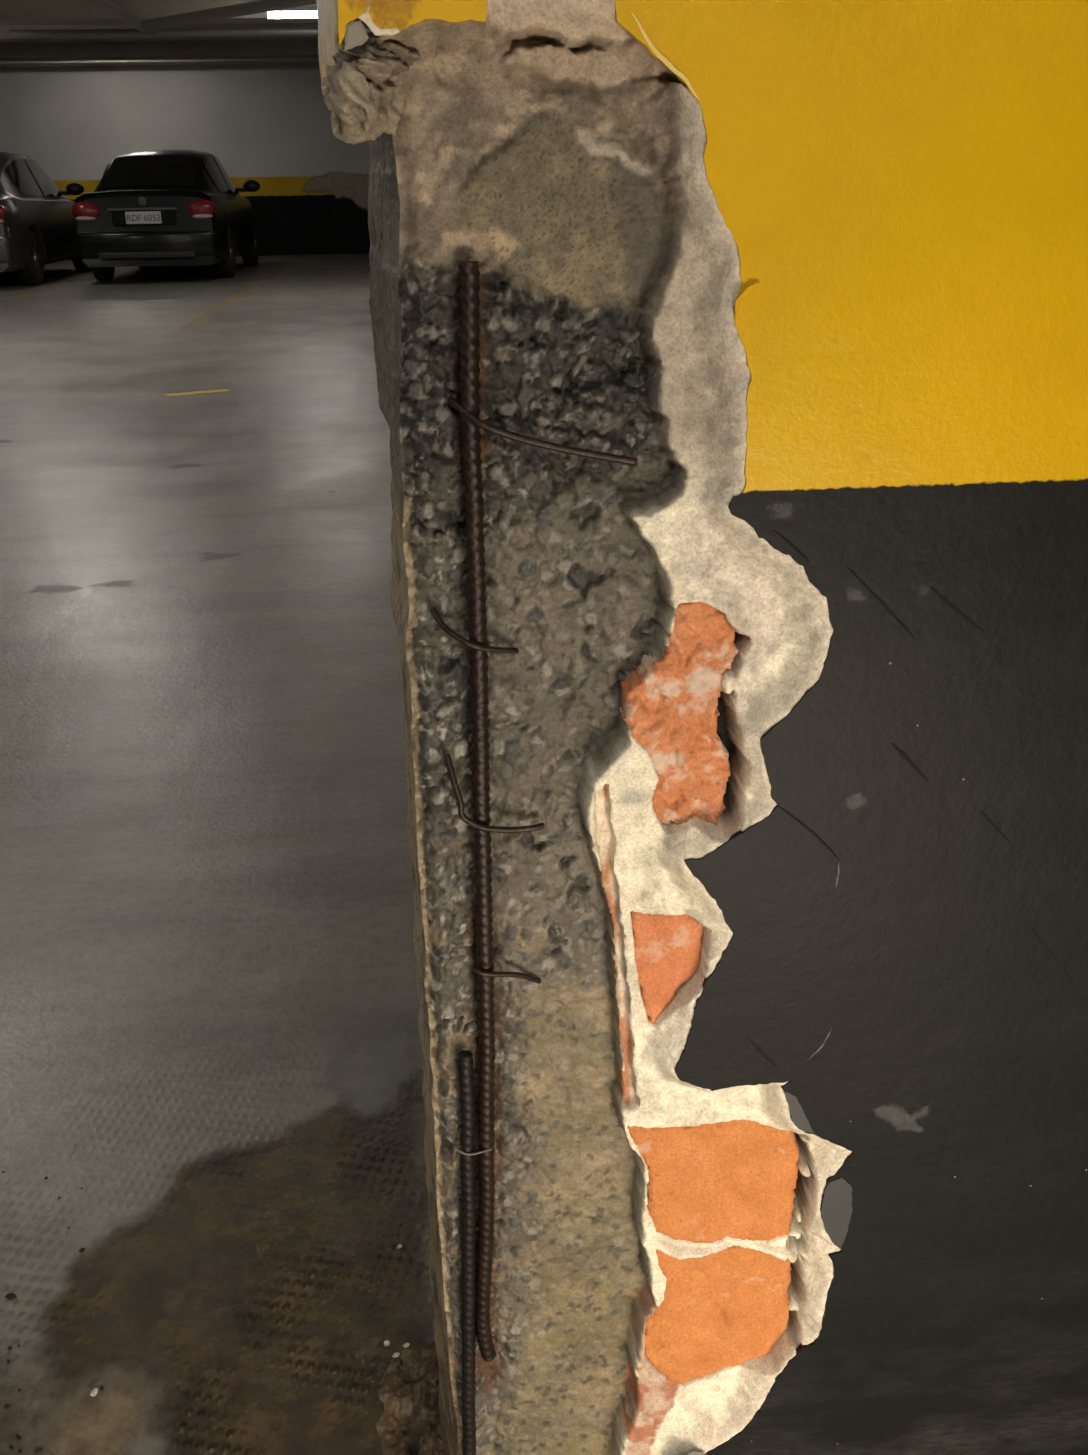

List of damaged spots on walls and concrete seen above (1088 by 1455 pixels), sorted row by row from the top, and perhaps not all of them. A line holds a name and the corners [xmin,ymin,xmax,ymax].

water stain [44,1019,428,1455]
spalling [304,0,853,1455]